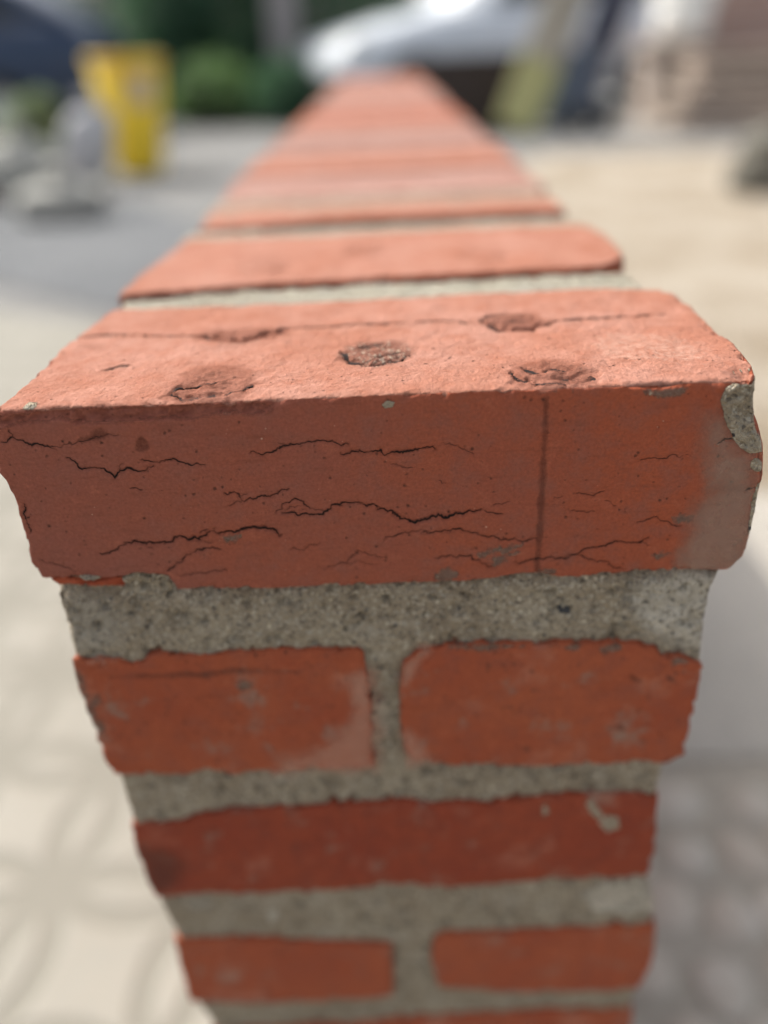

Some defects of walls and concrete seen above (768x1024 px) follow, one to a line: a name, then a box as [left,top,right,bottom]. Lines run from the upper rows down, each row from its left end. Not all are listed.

crack [3,431,203,490]
crack [251,440,472,468]
crack [99,489,680,577]